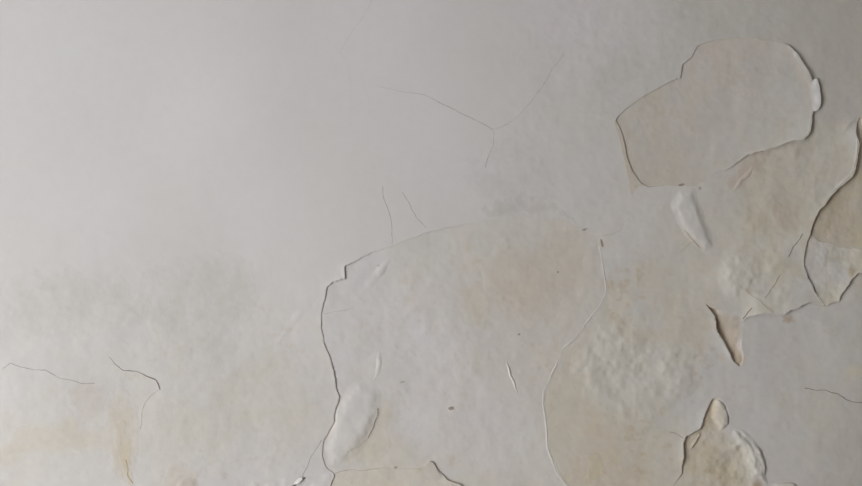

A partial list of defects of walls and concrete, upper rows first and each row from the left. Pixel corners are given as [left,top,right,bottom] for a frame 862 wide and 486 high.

peeling [614,38,862,322]
crack [1,363,95,384]
crack [109,357,161,429]
peeling [321,217,608,486]
crack [805,388,862,403]
crack [336,408,385,473]
peeling [674,398,799,486]